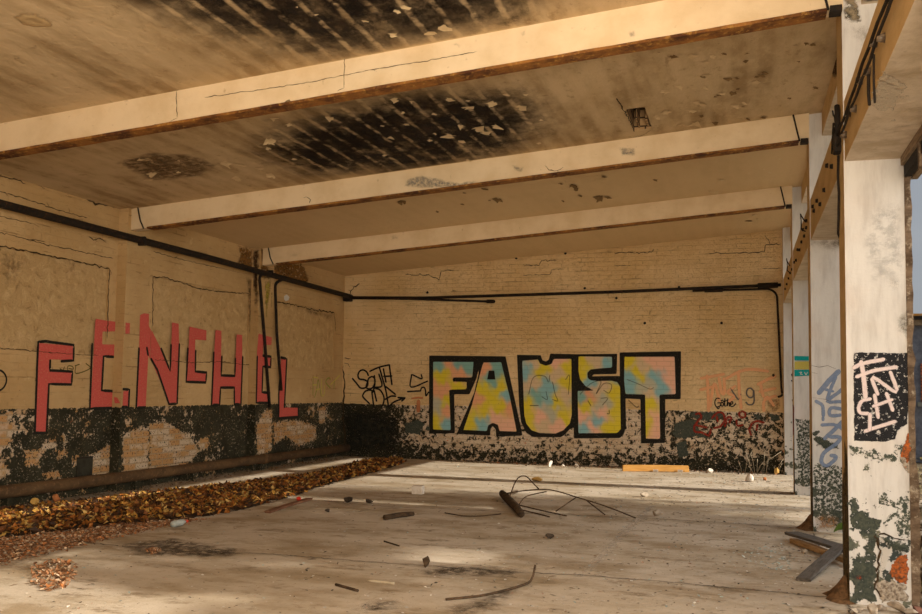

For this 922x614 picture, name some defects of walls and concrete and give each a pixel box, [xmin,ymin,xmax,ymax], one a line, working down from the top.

water stain [126,154,213,179]
peeling [0,409,15,478]
peeling [22,437,110,480]
peeling [121,417,211,472]
peeling [405,420,430,435]
peeling [795,419,911,604]